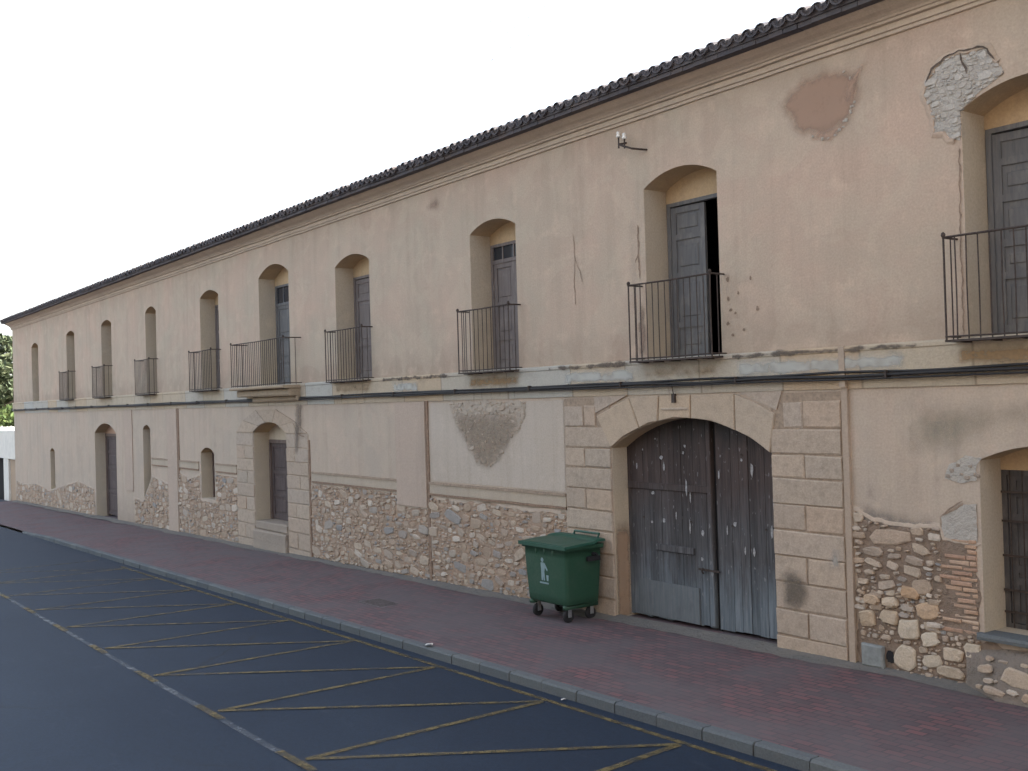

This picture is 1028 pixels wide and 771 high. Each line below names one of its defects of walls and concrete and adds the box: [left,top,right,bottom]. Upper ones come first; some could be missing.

flaking render [786,69,860,141]
spalling [919,43,1004,145]
spalling [449,399,526,467]
leakage [787,575,806,605]